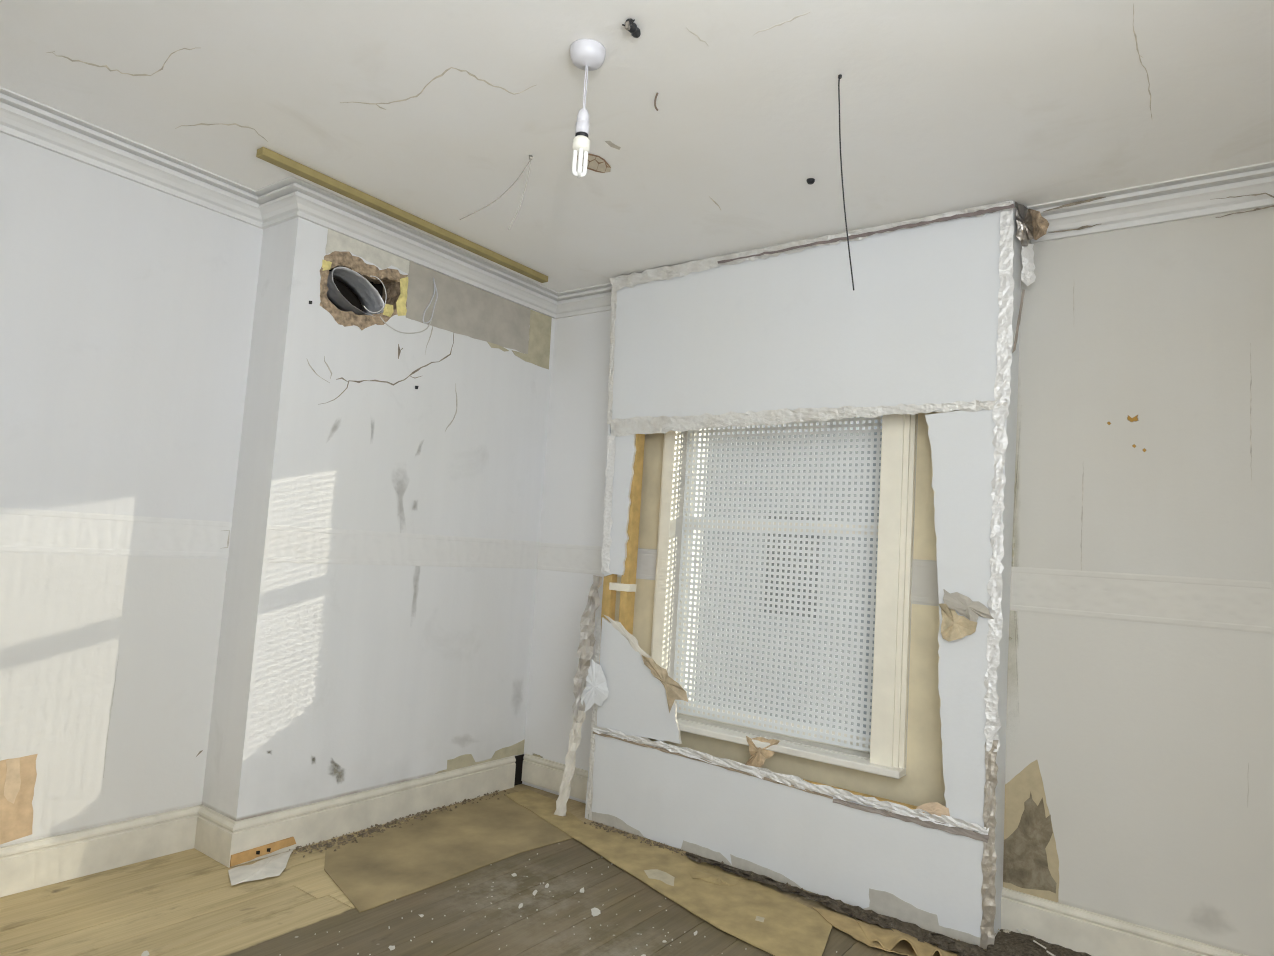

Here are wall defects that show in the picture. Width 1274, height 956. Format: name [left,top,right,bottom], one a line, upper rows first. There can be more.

crack [47,48,195,76]
crack [1133,6,1152,118]
crack [340,67,536,110]
spalling [1028,209,1049,240]
crack [1210,193,1274,218]
hole [320,251,408,330]
crack [307,326,457,431]